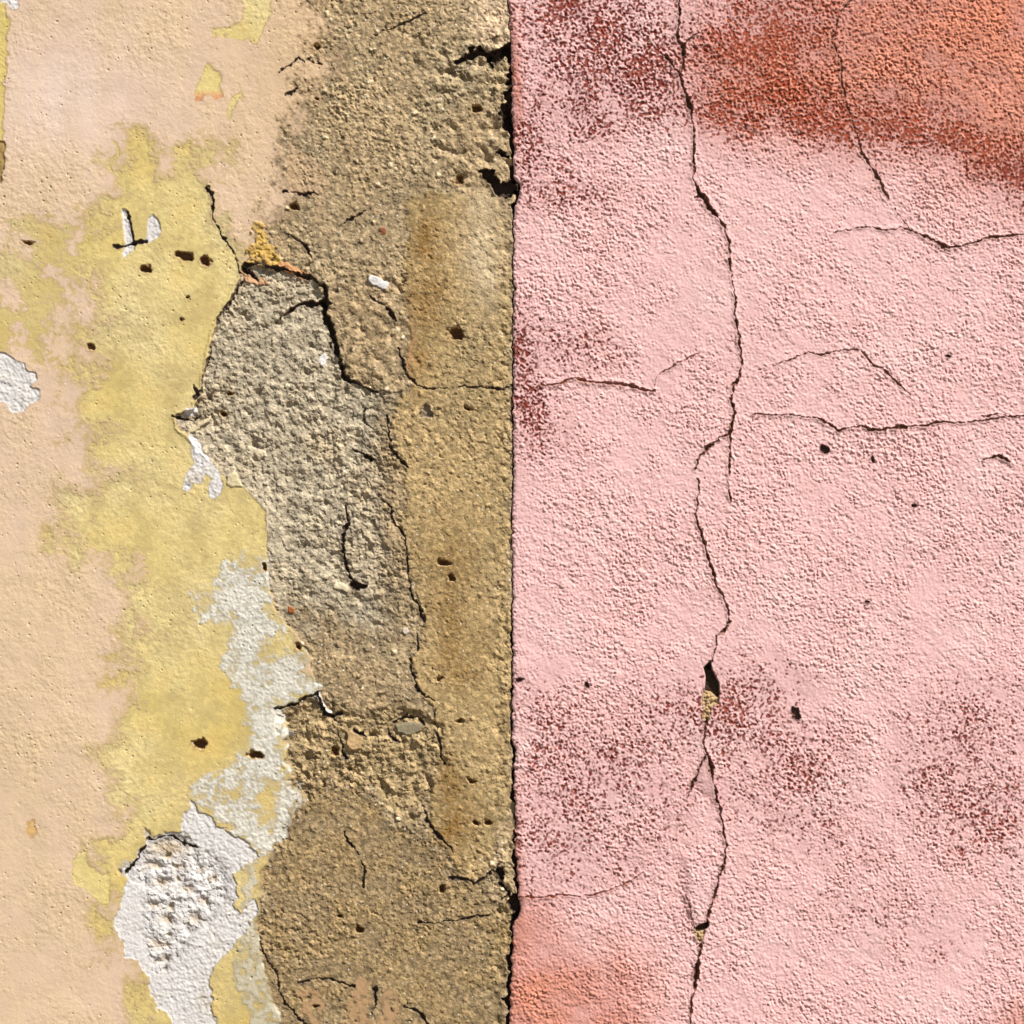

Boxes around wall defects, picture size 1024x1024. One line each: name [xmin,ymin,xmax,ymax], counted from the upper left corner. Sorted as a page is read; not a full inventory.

peeling [0,0,524,1024]
crack [171,185,408,468]
crack [397,2,520,536]
crack [541,354,698,392]
crack [664,0,1024,665]
crack [417,572,643,1024]
crack [685,720,728,1024]